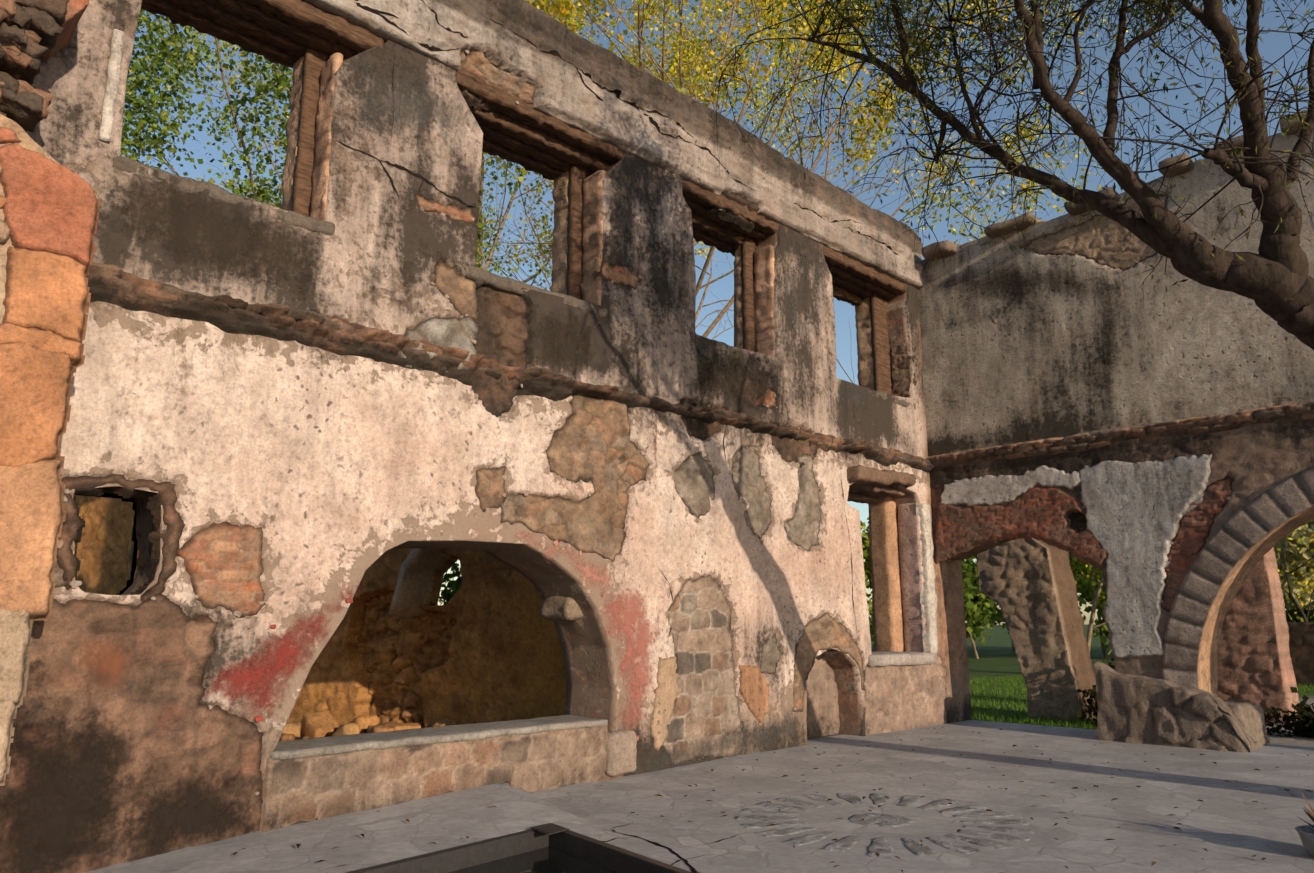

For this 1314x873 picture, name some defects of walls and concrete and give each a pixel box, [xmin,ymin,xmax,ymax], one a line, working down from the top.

crack [336,66,474,207]
water stain [362,72,453,170]
crack [355,0,752,189]
crack [794,203,899,255]
water stain [944,266,1120,409]
flaking render [475,384,1234,765]
spalling [0,474,325,873]
spalling [338,591,457,728]
water stain [123,775,254,860]